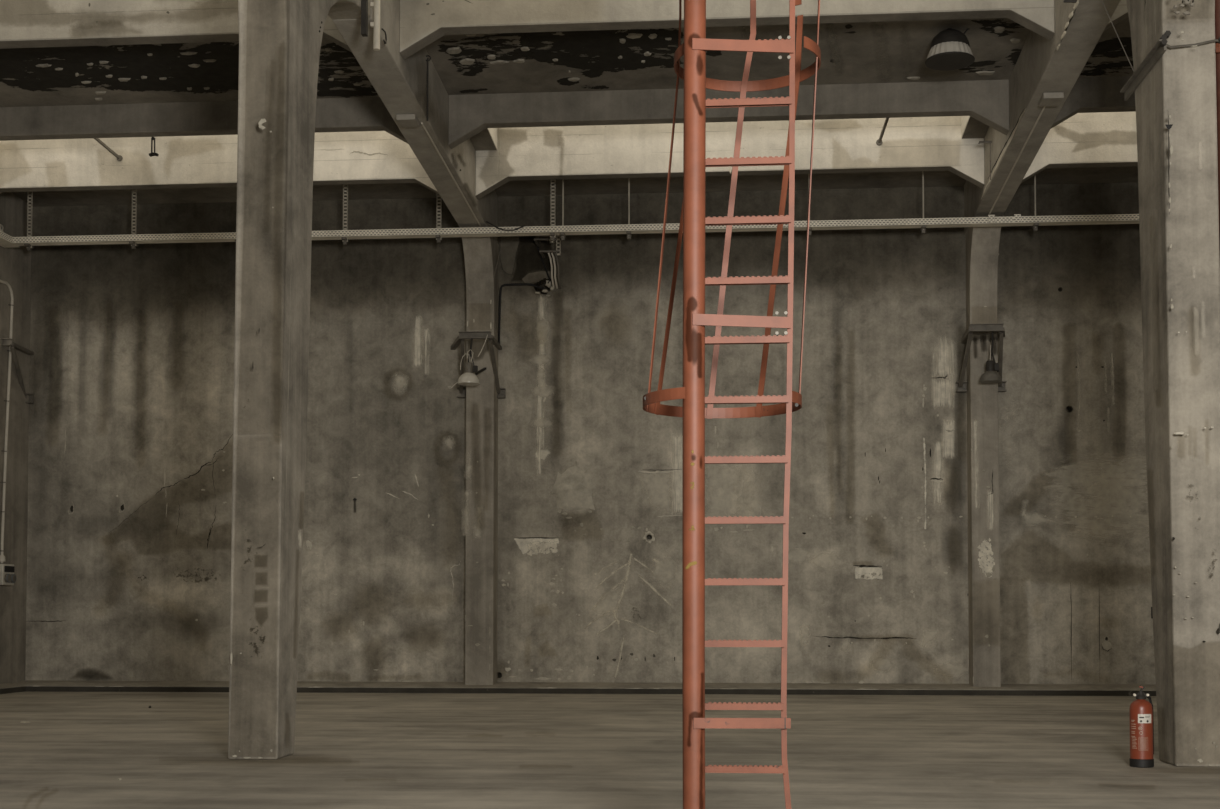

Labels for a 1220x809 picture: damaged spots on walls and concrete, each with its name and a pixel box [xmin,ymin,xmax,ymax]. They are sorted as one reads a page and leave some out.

peeling [0,41,239,101]
peeling [437,28,684,93]
crack [112,434,233,549]